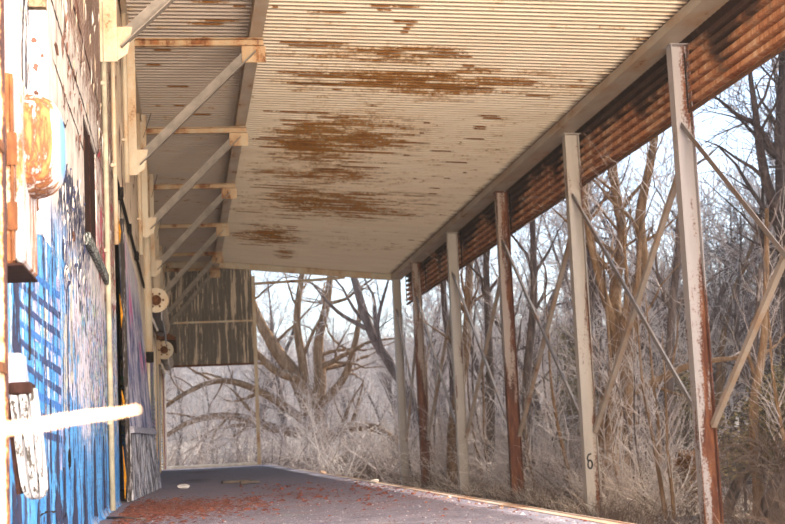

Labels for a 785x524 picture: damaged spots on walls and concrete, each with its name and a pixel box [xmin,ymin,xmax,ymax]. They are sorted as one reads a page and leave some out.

rust [366,4,419,33]
rust [275,41,586,99]
rust [234,110,439,259]